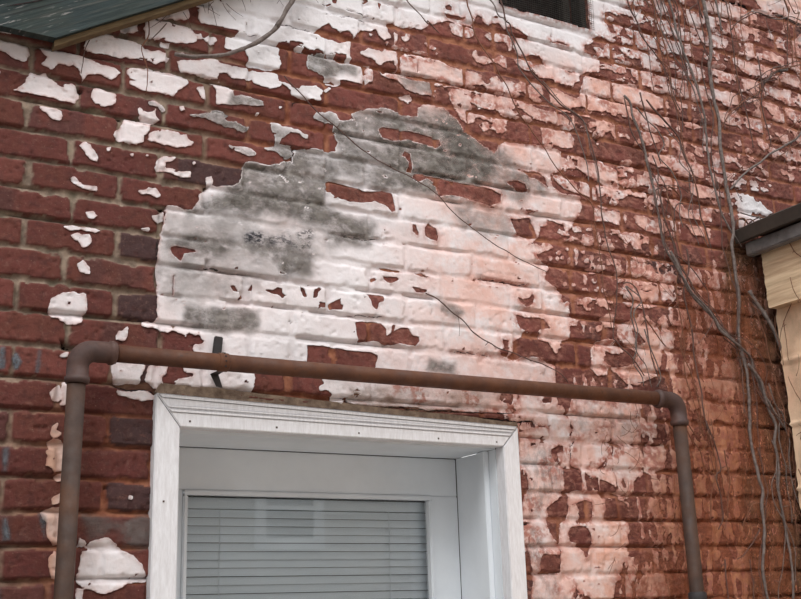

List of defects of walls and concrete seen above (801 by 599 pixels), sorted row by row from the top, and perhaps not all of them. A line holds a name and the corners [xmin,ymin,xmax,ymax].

peeling [14,9,217,103]
peeling [107,101,194,151]
leakage [191,111,248,131]
leakage [230,94,262,104]
leakage [203,109,541,275]
peeling [126,0,801,383]
leakage [185,308,258,332]
peeling [111,363,168,401]
leakage [429,360,454,372]
peeling [548,245,801,599]
peeling [319,379,688,599]
peeling [75,537,147,599]